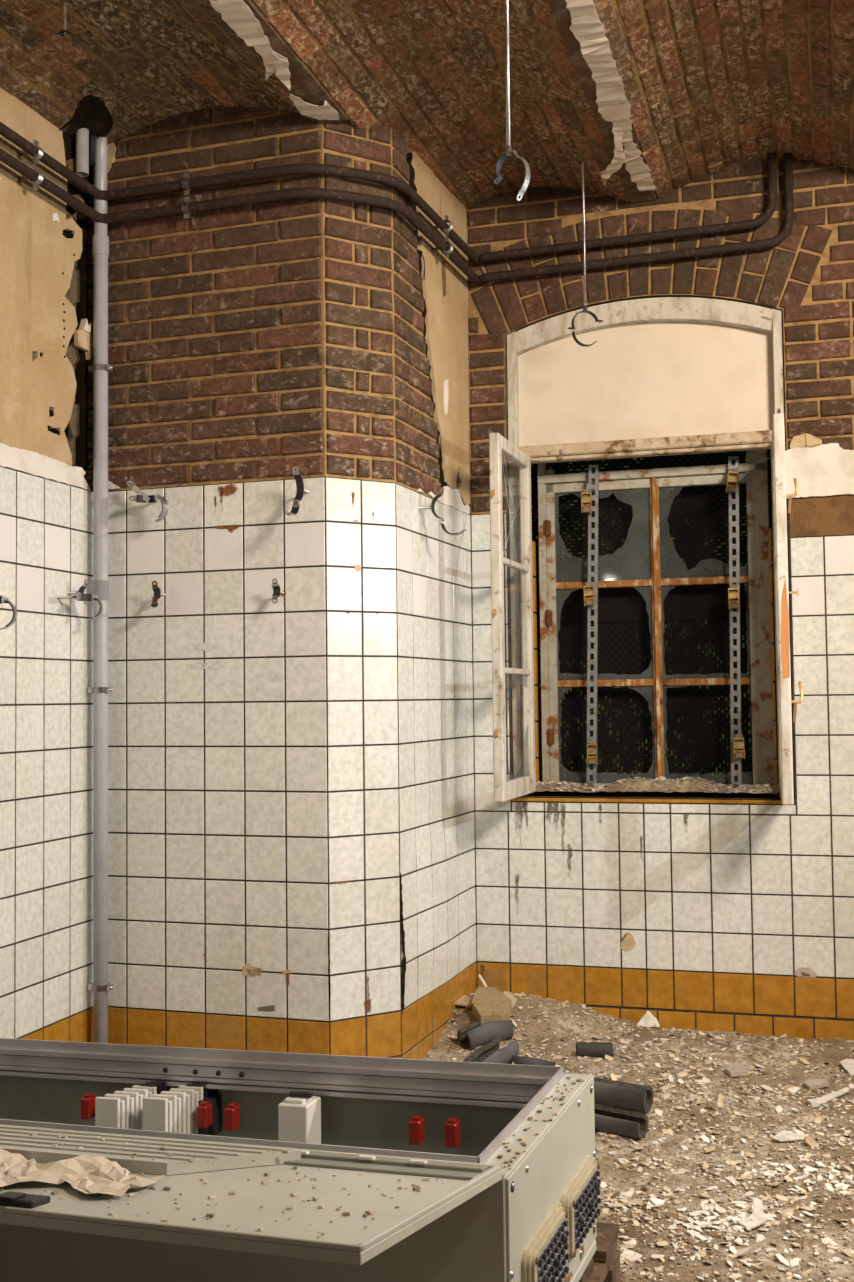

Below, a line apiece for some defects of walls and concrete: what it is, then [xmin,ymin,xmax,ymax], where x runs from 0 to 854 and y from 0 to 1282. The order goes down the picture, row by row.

peeling [210,0,339,120]
peeling [565,0,656,191]
spalling [47,134,116,471]
crack [406,153,447,488]
crack [399,873,407,1009]